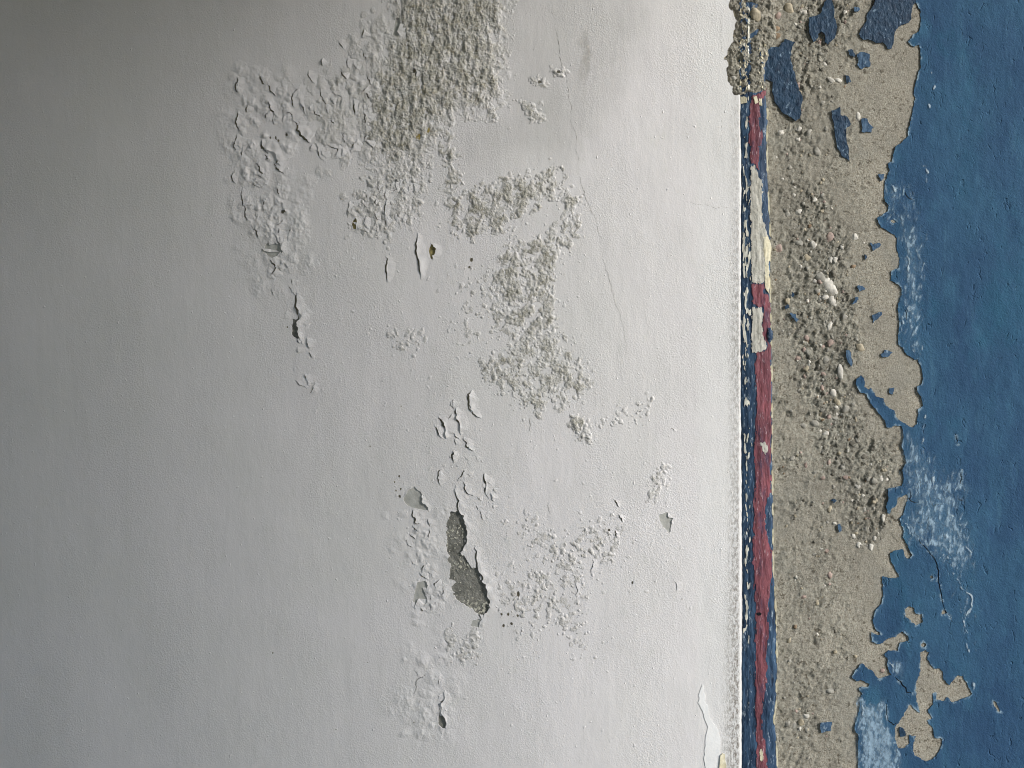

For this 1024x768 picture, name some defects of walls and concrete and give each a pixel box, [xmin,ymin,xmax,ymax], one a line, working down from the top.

flaking render [234,0,532,233]
peeling [232,139,317,357]
peeling [725,0,923,768]
peeling [404,390,501,627]
crack [908,473,962,623]
peeling [420,680,452,729]
peeling [895,642,972,761]